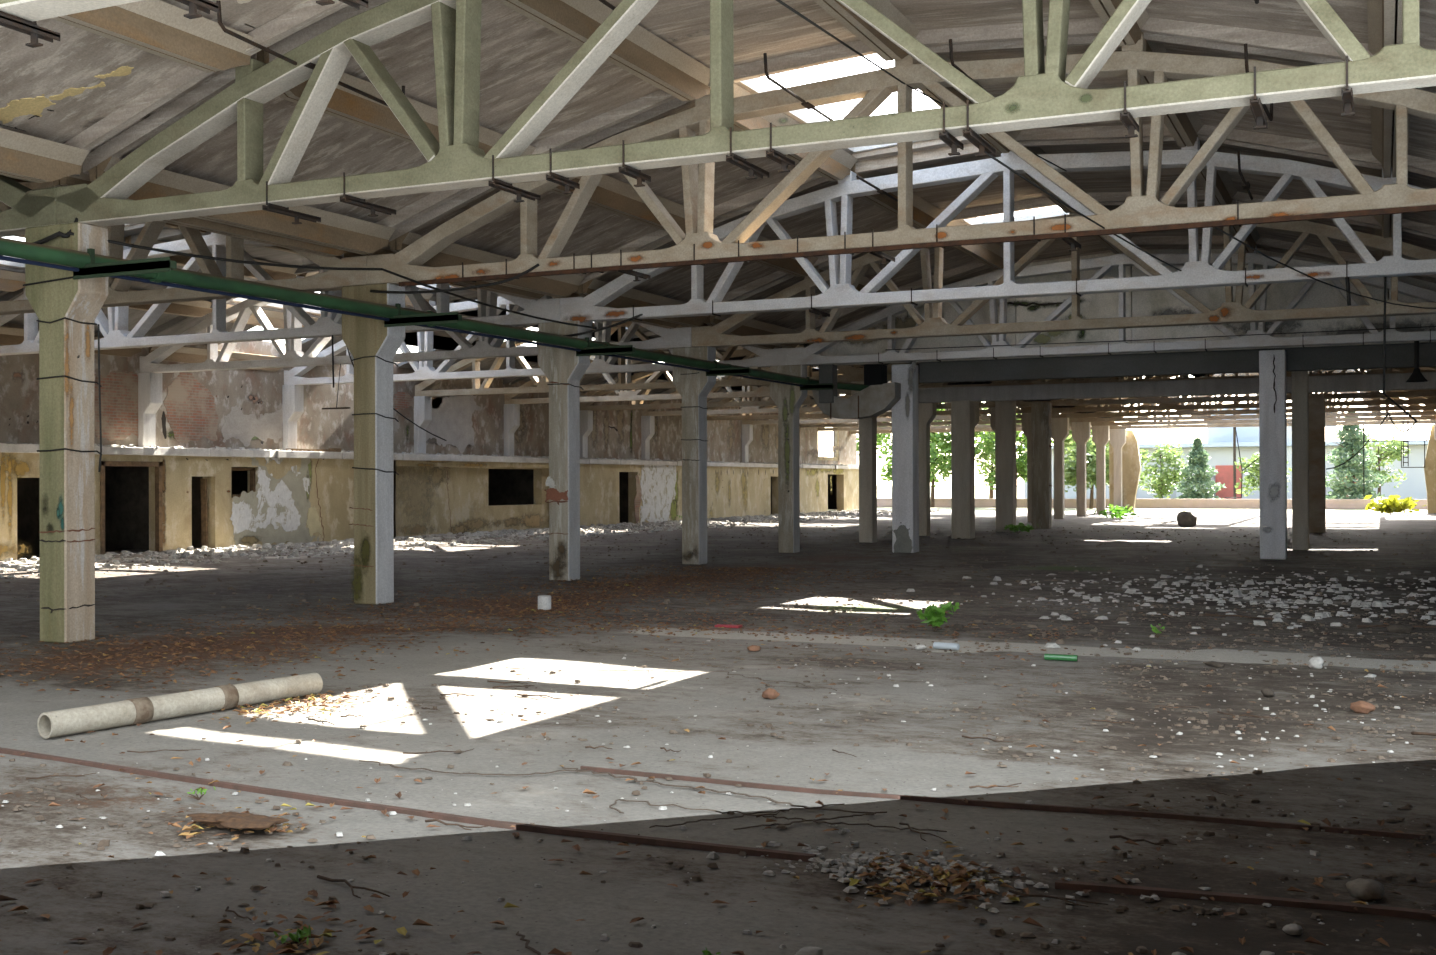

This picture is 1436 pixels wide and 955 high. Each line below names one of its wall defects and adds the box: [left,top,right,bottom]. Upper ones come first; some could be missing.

peeling [0,66,134,124]
damp [0,456,30,526]
peeling [221,405,324,546]
damp [0,544,28,557]
crack [359,760,947,832]